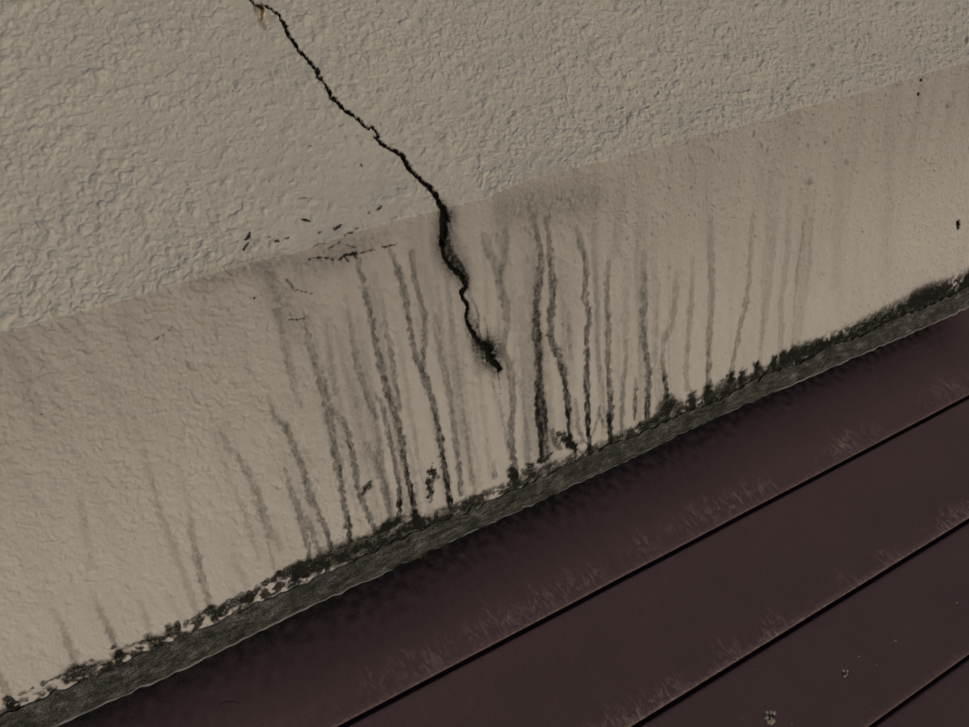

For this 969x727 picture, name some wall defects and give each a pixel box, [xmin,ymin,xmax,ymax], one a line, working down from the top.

crack [250,0,502,373]
leakage [0,255,969,717]